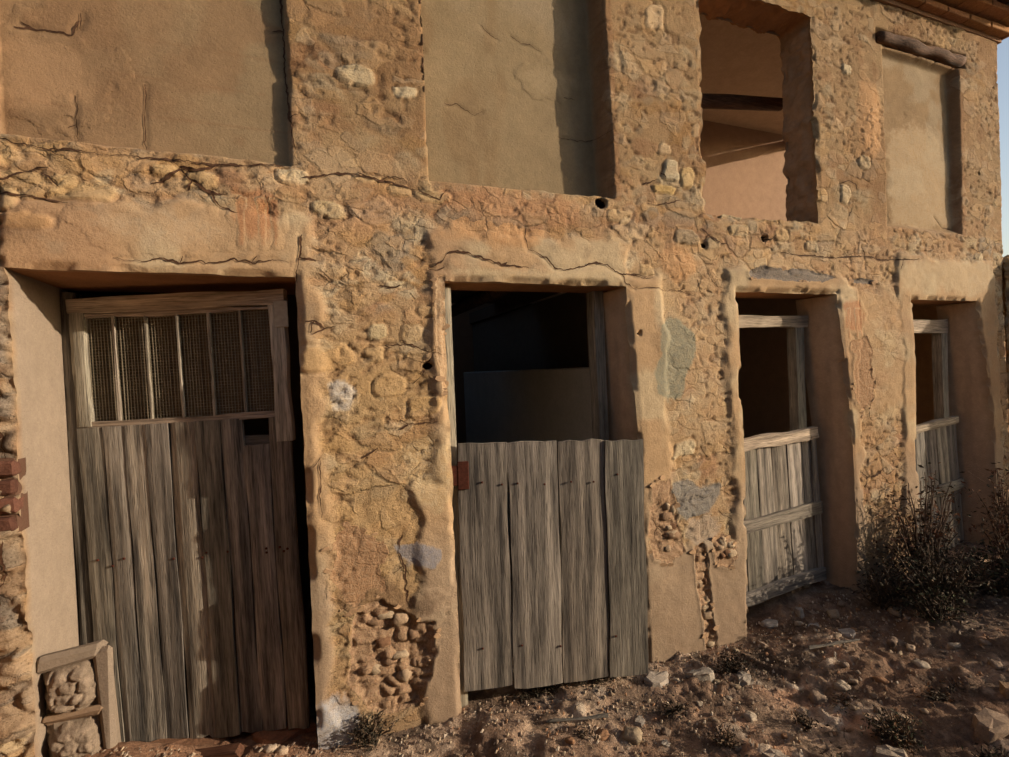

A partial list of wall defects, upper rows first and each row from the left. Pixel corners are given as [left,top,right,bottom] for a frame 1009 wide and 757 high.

crack [0,0,445,213]
crack [428,227,728,297]
spalling [321,510,441,717]
crack [393,532,410,608]
spalling [644,474,741,652]